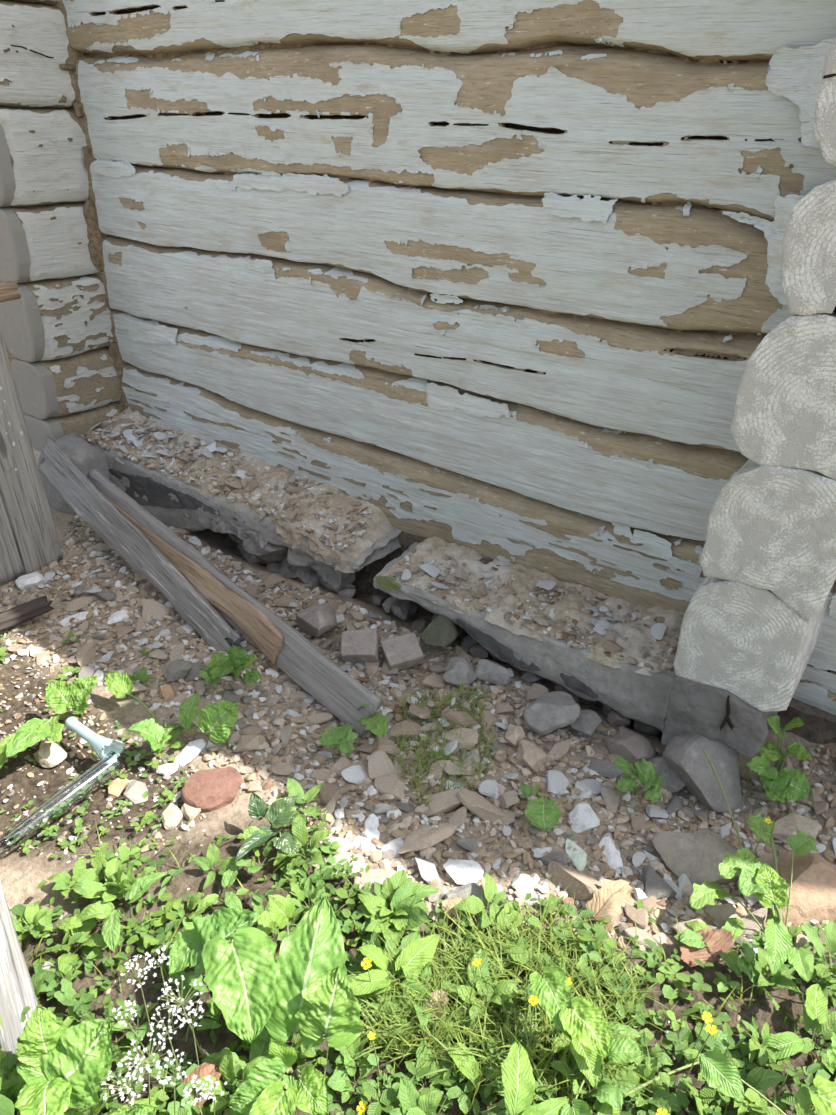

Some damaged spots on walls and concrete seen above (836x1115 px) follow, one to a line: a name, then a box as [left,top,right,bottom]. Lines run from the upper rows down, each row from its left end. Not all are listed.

peeling [66,11,171,51]
crack [93,0,225,16]
peeling [92,0,834,148]
crack [105,111,368,120]
peeling [158,134,545,197]
crack [430,121,565,134]
crack [609,135,784,146]
peeling [247,148,805,361]
peeling [128,319,745,480]
peeling [291,428,702,578]
spalling [179,507,361,573]
crack [720,695,734,730]